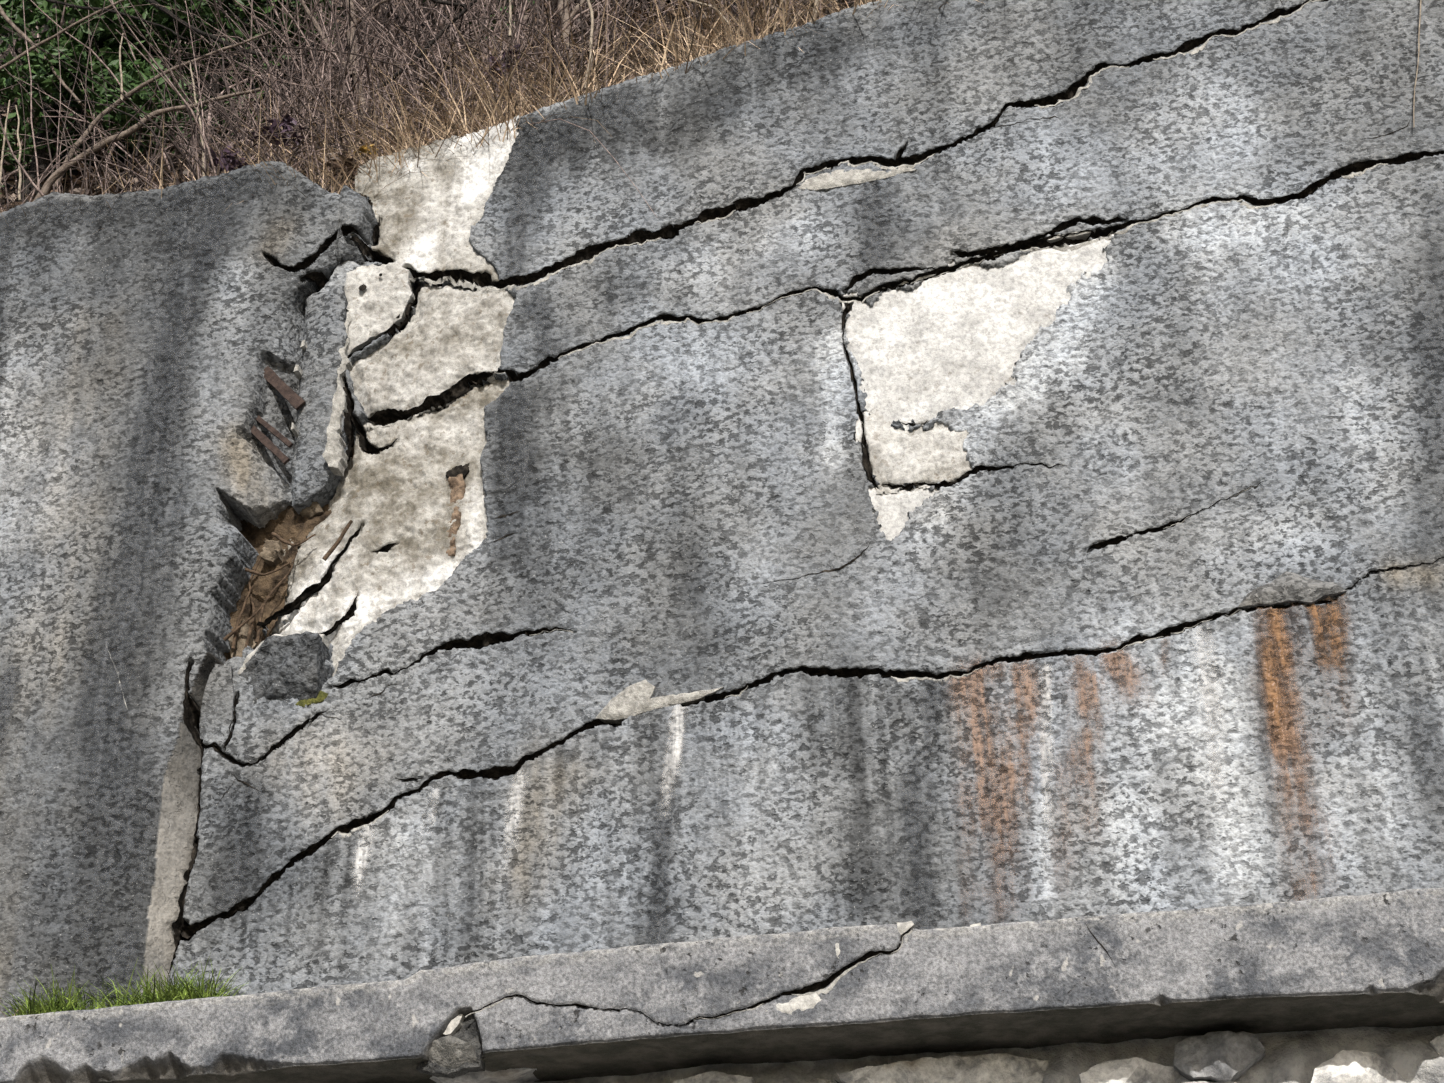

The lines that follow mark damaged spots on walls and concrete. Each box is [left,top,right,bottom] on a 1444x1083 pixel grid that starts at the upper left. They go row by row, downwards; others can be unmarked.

crack [264,0,1444,490]
spalling [223,115,519,677]
spalling [842,230,1116,541]
crack [256,523,396,636]
crack [168,627,623,976]
corrosion [446,463,470,556]
corrosion [953,663,1036,857]
crack [670,557,1444,706]
corrosion [1073,651,1137,784]
corrosion [1259,607,1310,833]
corrosion [1309,599,1344,668]
crack [464,927,913,1026]